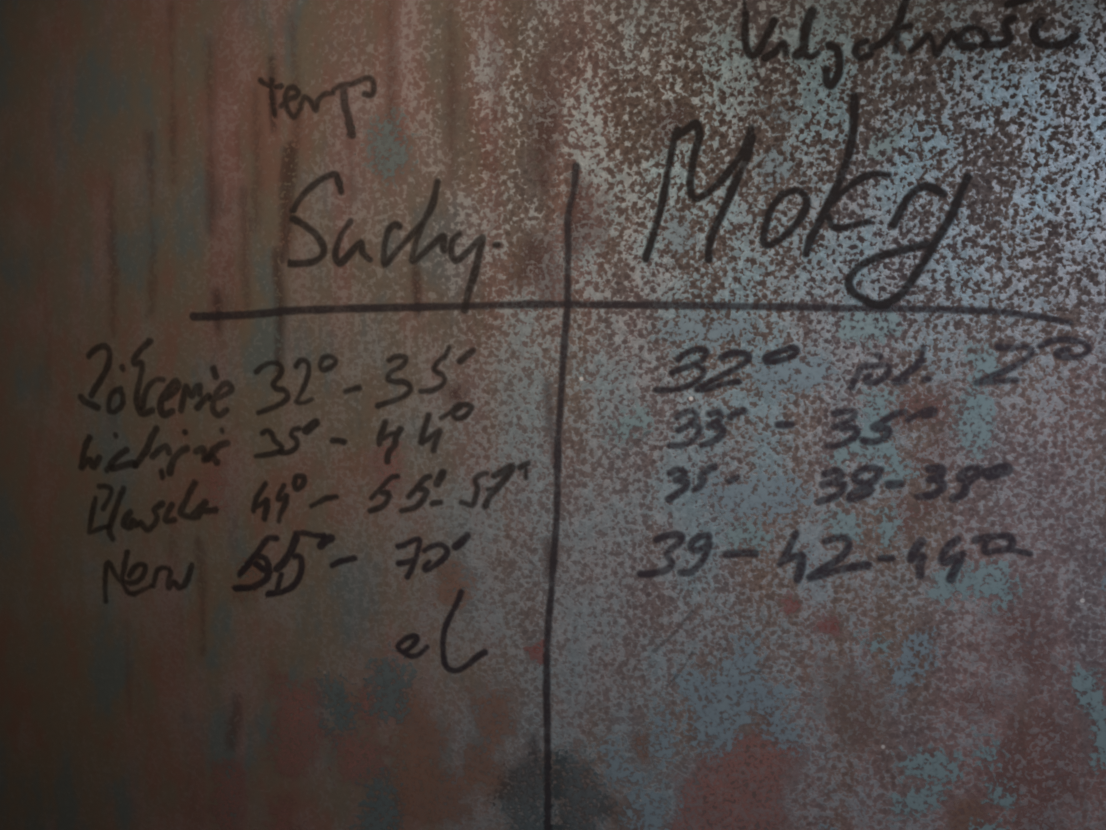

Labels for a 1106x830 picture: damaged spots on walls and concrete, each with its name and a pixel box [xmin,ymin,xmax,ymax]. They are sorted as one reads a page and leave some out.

corrosion [997,712,1074,830]